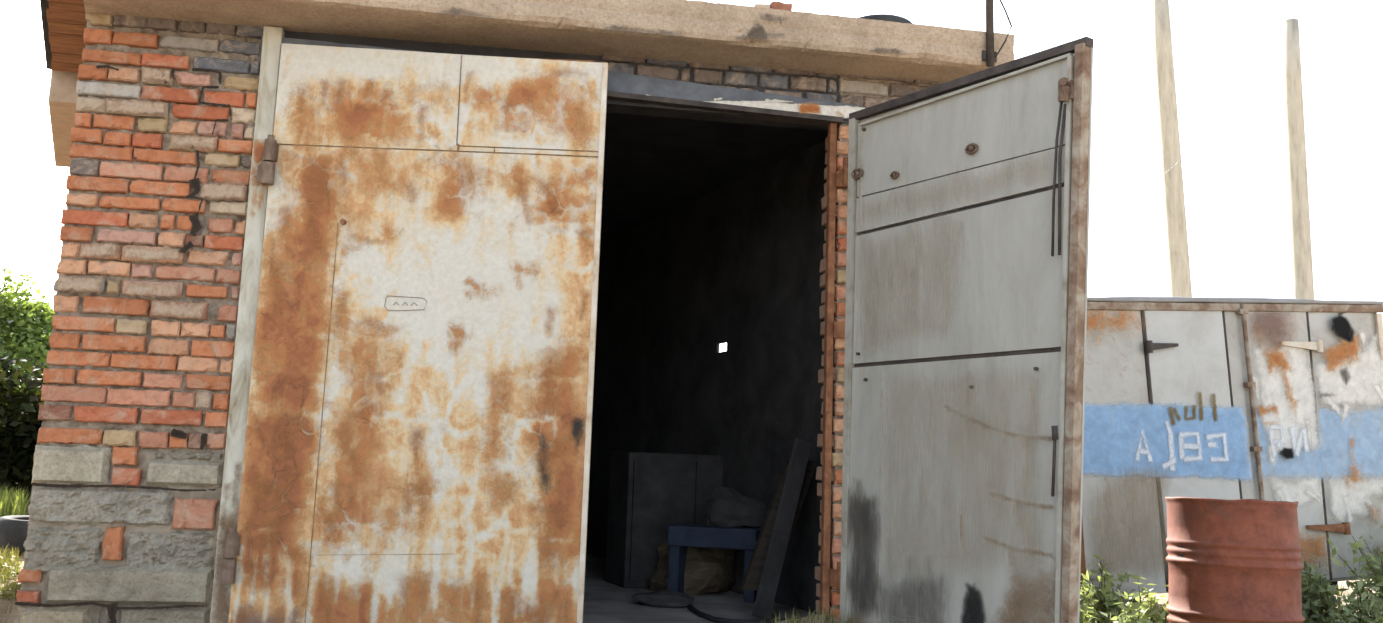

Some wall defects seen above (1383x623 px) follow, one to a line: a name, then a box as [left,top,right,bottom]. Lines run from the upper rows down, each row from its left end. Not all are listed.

rust [473,71,593,144]
rust [212,82,596,623]
water stain [848,496,940,623]
water stain [961,586,985,623]